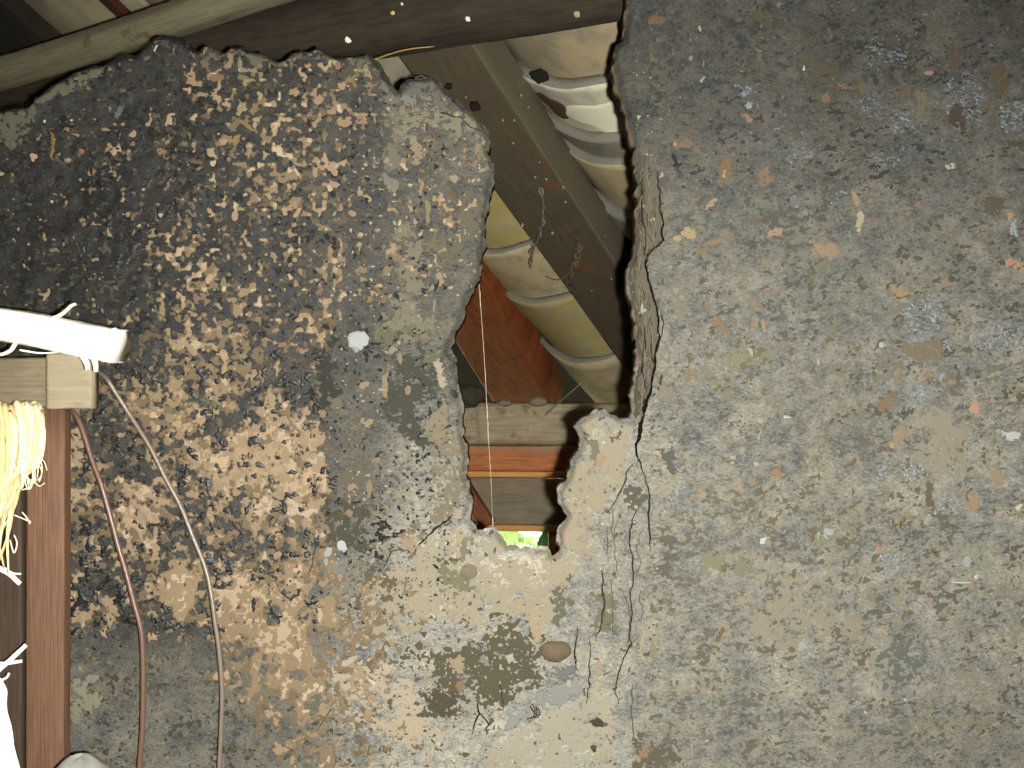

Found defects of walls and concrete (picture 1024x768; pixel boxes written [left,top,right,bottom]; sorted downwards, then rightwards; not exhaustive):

peeling [12,46,551,768]
leakage [313,335,353,427]
leakage [369,330,458,462]
crack [574,161,665,740]
leakage [321,494,375,556]
leakage [436,537,482,601]
peeling [559,488,590,556]
leakage [399,577,574,725]